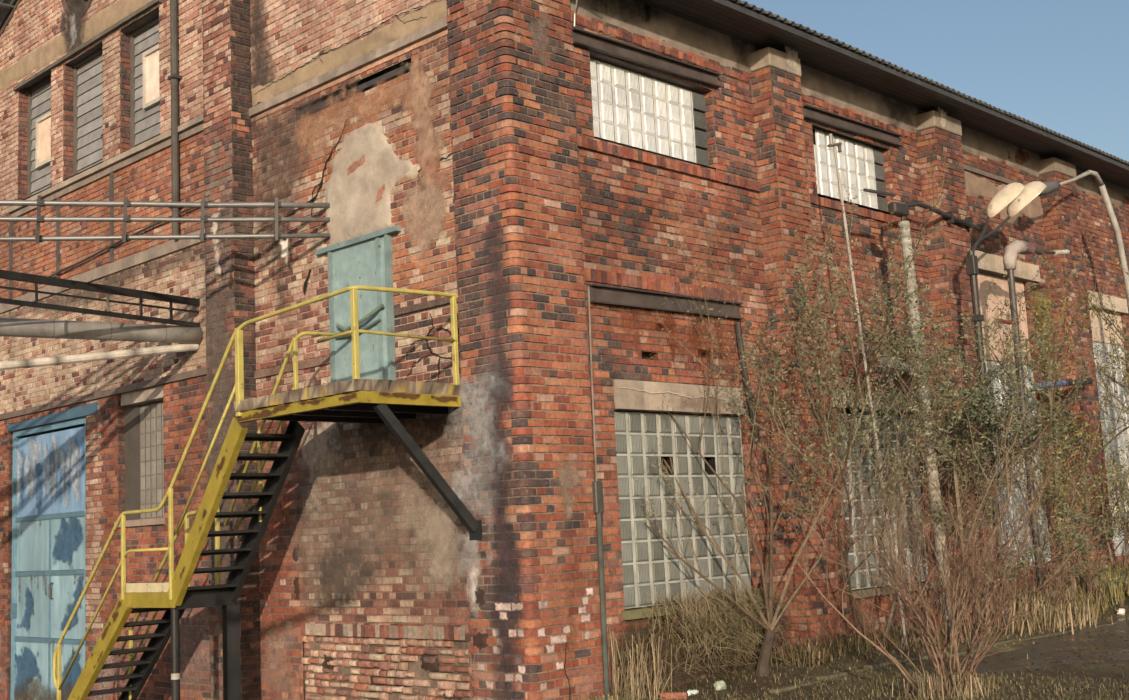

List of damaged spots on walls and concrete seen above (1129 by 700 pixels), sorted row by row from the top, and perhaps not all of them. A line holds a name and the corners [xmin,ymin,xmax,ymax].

damp [60,3,85,53]
crack [255,119,348,234]
flaking render [296,55,455,251]